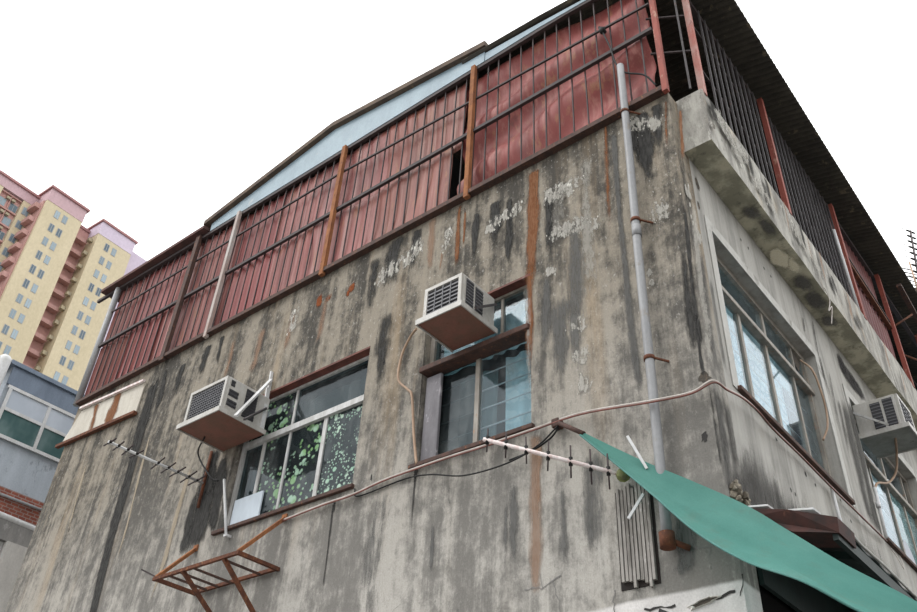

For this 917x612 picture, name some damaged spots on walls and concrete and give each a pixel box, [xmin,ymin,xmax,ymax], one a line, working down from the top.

peeling [374,238,423,287]
corrosion [526,170,539,369]
peeling [544,175,585,206]
water stain [542,162,594,370]
peeling [546,216,600,242]
water stain [630,104,662,178]
water stain [681,208,725,374]
water stain [90,364,185,612]
water stain [153,450,227,591]
corrosion [531,437,541,584]
crack [525,572,561,612]
crack [644,603,676,611]